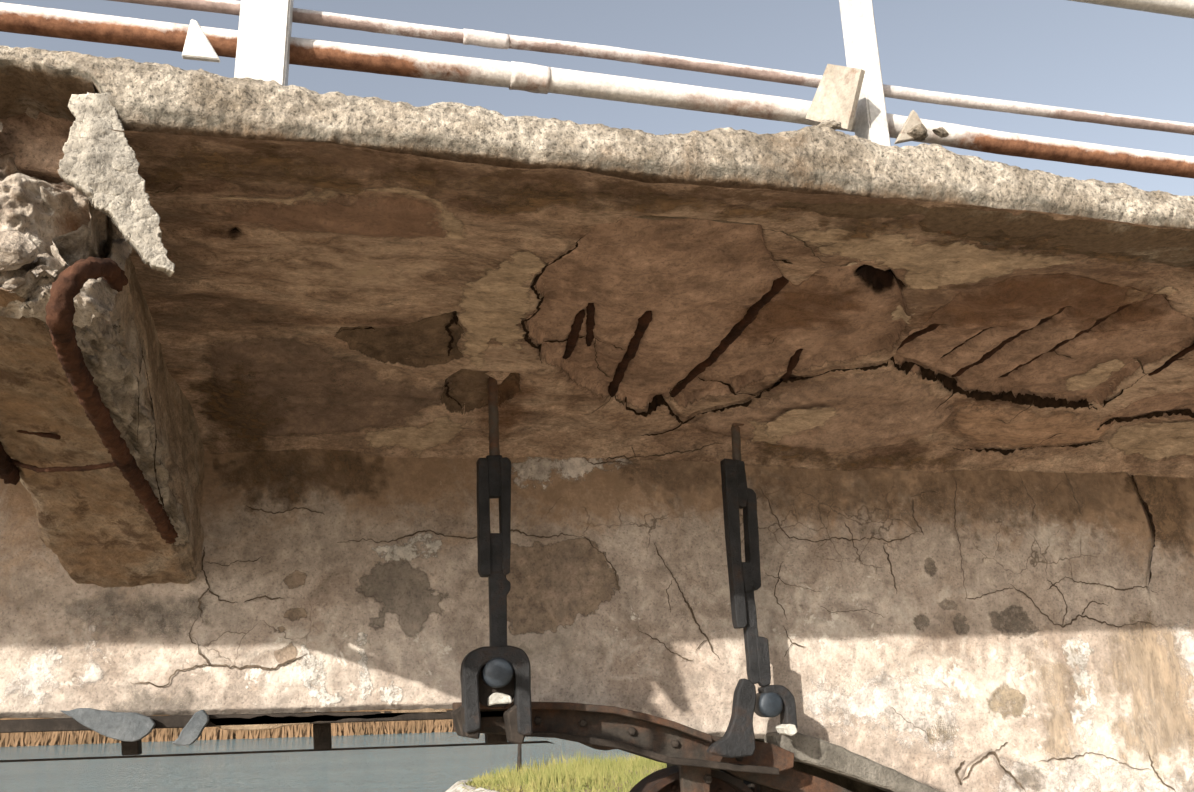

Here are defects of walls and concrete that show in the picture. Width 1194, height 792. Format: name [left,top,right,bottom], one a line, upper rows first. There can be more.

peeling [58,92,175,277]
spalling [11,226,190,546]
spalling [334,217,1194,462]
crack [521,237,1194,518]
spalling [0,441,20,485]
crack [130,547,307,687]
crack [337,530,477,543]
crack [511,529,620,593]
crack [636,543,720,661]
crack [760,474,1162,657]
crack [955,742,1025,790]
crack [1039,752,1176,792]